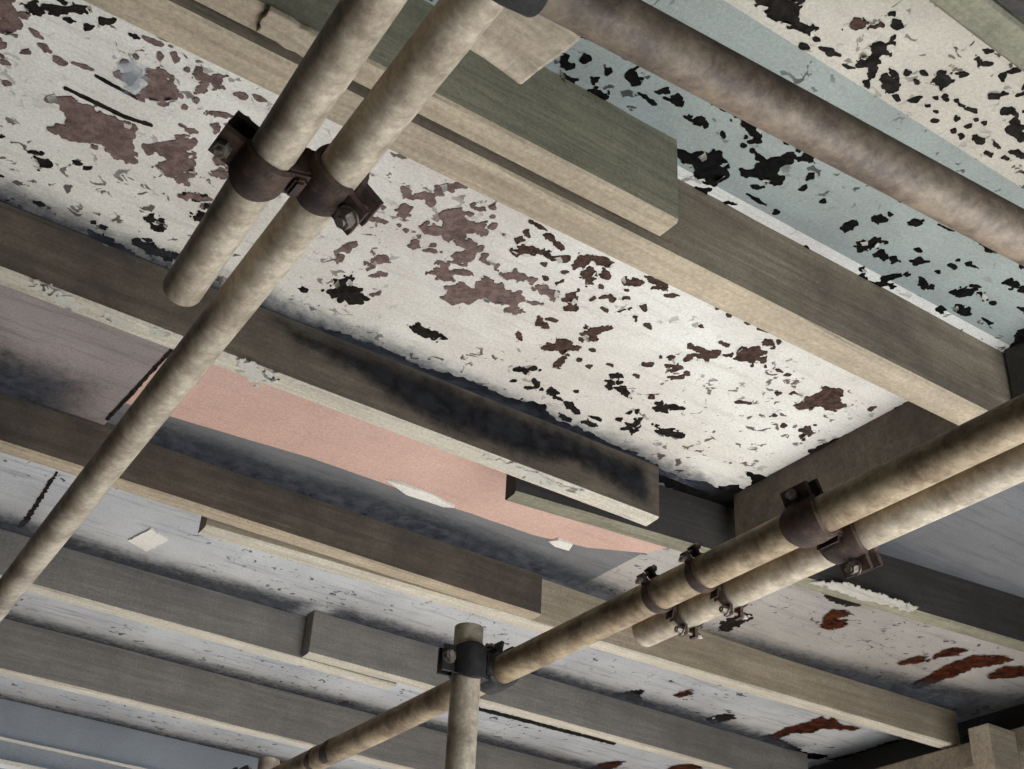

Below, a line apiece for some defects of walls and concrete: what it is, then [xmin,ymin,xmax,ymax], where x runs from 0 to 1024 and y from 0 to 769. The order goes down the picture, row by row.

peeling [0,0,117,71]
peeling [755,0,1024,174]
peeling [44,94,229,222]
peeling [560,53,815,215]
peeling [840,201,979,290]
peeling [369,180,680,461]
peeling [604,322,792,439]
crack [19,471,58,525]
rust [820,610,851,630]
rust [898,648,1024,686]
rust [595,761,626,769]
rust [769,717,860,739]